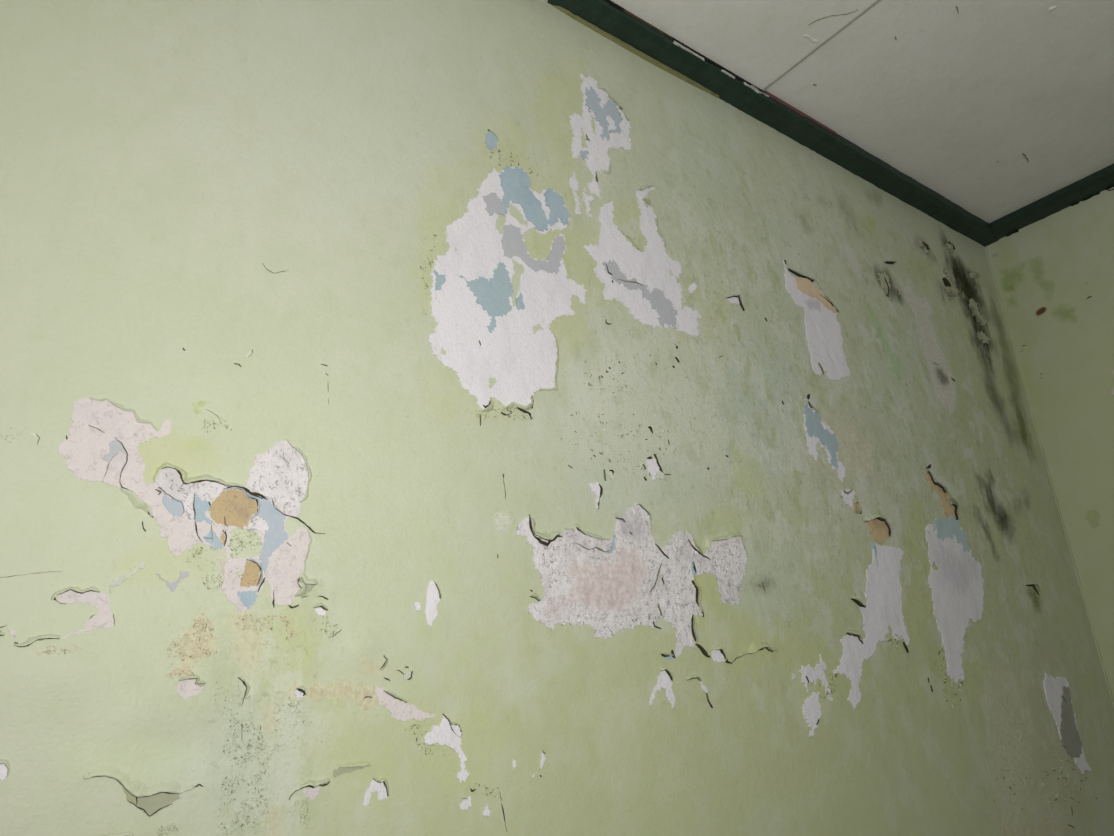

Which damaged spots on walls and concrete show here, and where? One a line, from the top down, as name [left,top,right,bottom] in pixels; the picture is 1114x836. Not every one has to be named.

peeling [419,73,703,426]
peeling [783,260,851,381]
leakage [877,261,955,411]
leakage [942,241,990,348]
peeling [50,397,326,645]
peeling [515,503,748,709]
peeling [792,394,910,737]
peeling [925,515,984,708]
peeling [83,766,204,836]
peeling [166,612,312,836]
peeling [288,760,389,827]
peeling [364,666,500,817]